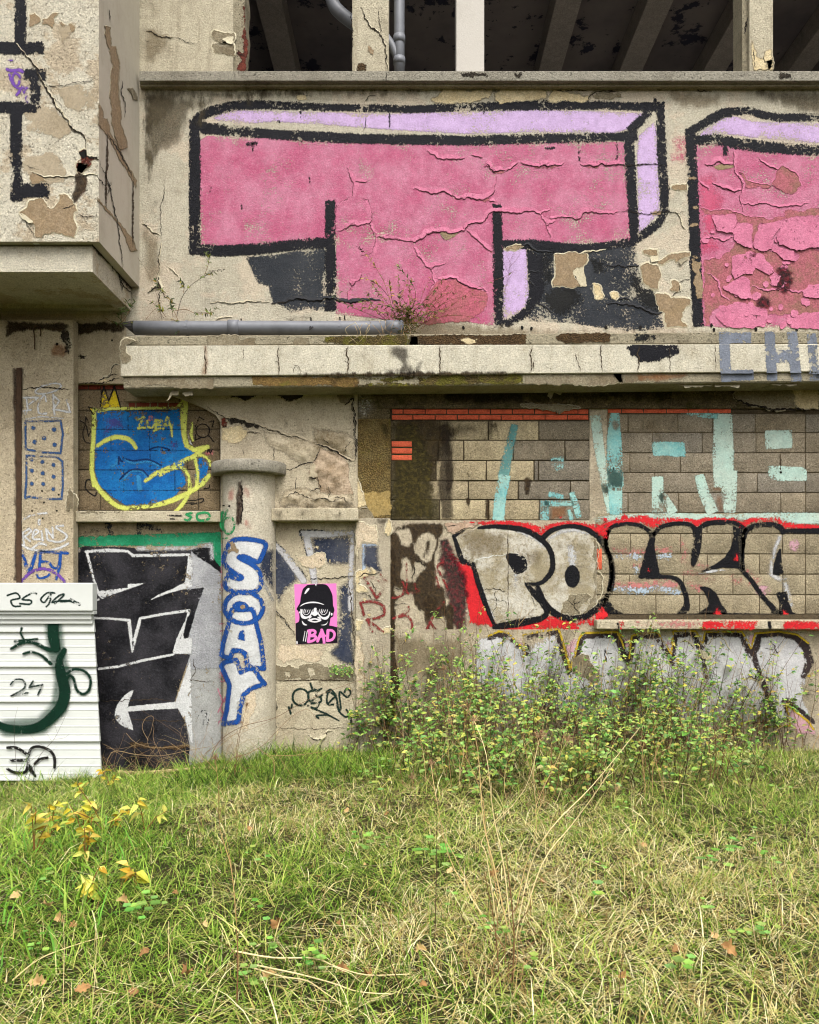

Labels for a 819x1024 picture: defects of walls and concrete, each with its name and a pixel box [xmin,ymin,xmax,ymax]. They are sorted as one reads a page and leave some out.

peeling [97,25,138,188]
spalling [210,6,248,71]
crack [350,7,389,131]
spalling [750,40,792,80]
spalling [18,193,79,239]
crack [16,43,179,311]
peeling [97,197,138,252]
peeling [324,149,819,345]
spalling [220,416,259,444]
crack [207,398,358,502]